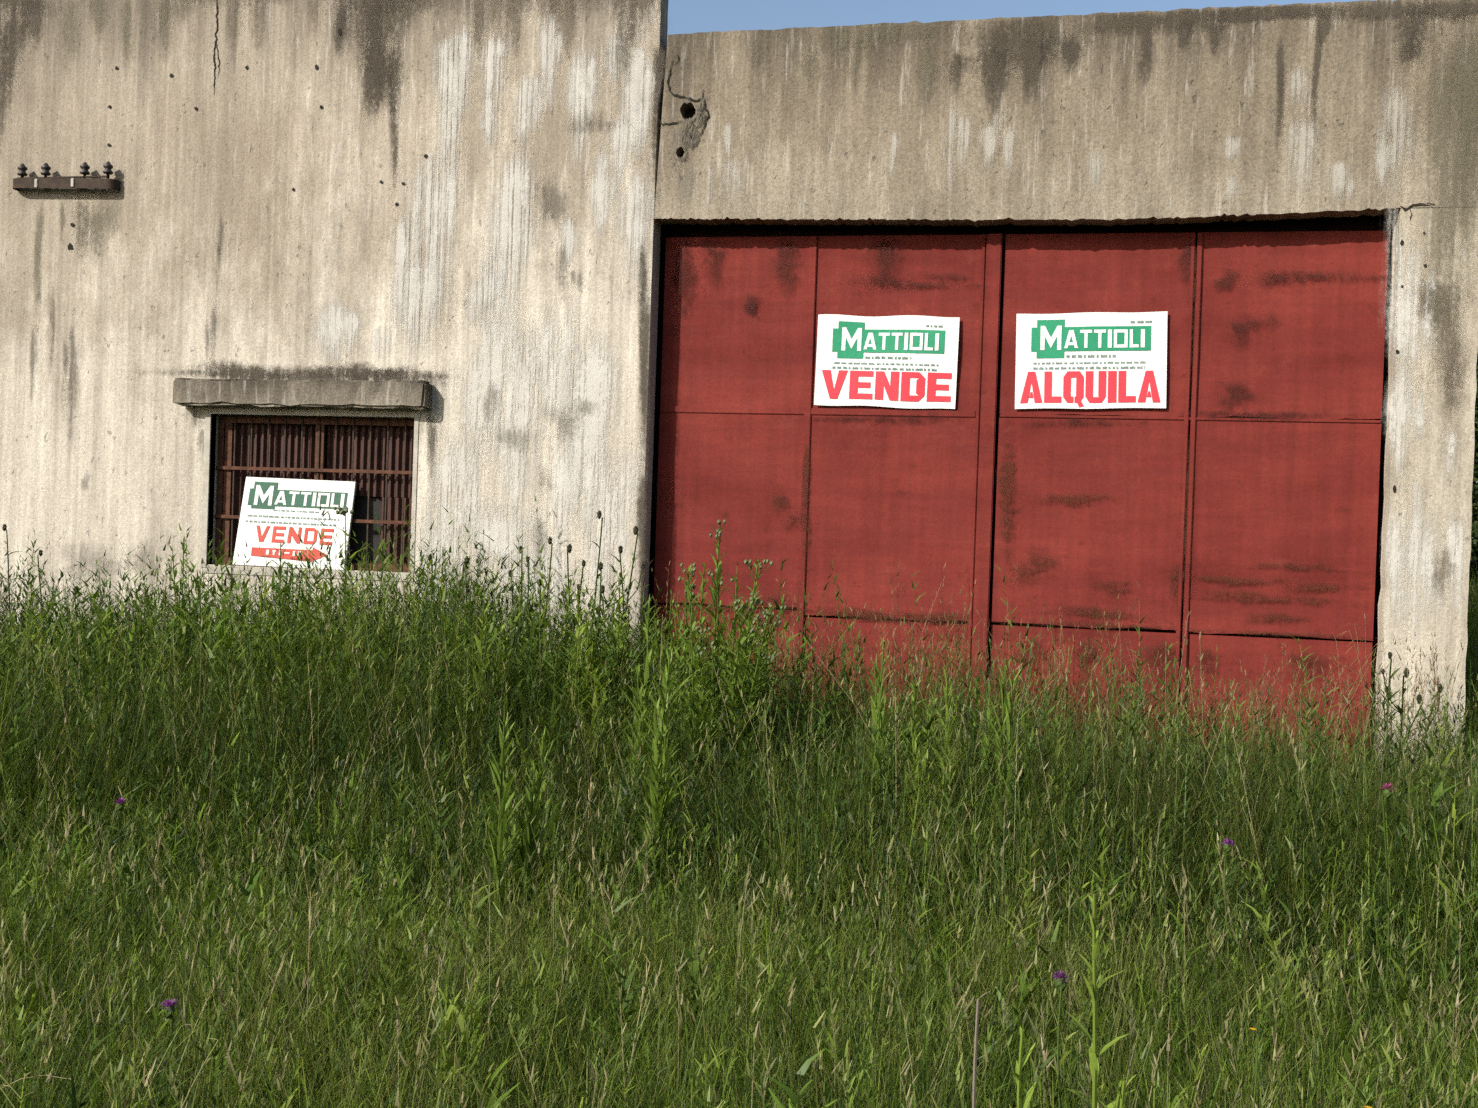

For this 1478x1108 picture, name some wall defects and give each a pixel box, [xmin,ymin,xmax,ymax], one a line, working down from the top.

water stain [0,0,43,132]
water stain [949,20,1079,179]
water stain [1140,31,1152,80]
water stain [1276,0,1478,185]
water stain [190,0,666,451]
water stain [707,126,740,205]
water stain [1333,163,1353,196]
water stain [1420,287,1459,402]
water stain [637,478,646,600]